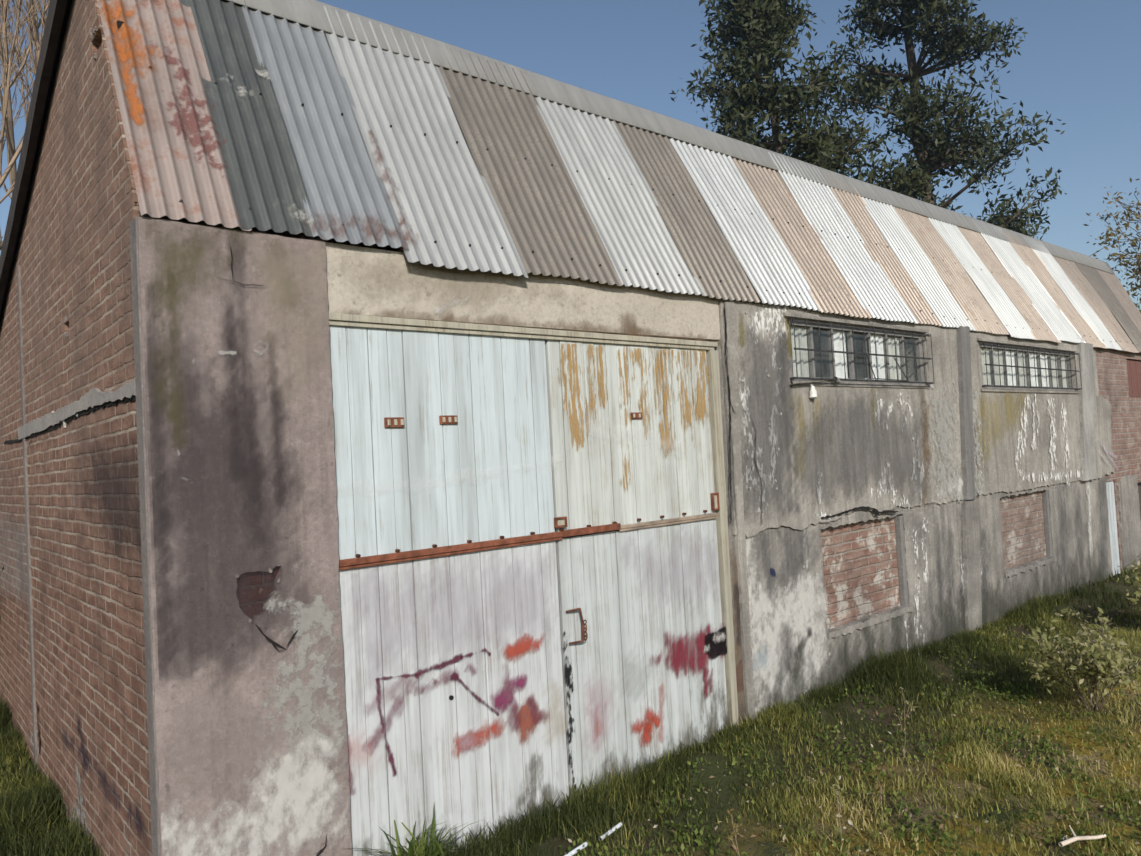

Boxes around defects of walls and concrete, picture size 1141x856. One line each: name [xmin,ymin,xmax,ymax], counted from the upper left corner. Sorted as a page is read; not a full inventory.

rust [103,0,226,178]
rust [626,322,650,337]
leakage [739,301,793,515]
leakage [815,470,831,521]
crack [821,506,899,518]
leakage [869,393,927,509]
leakage [965,391,984,501]
leakage [1015,394,1092,550]
peeling [161,566,346,856]